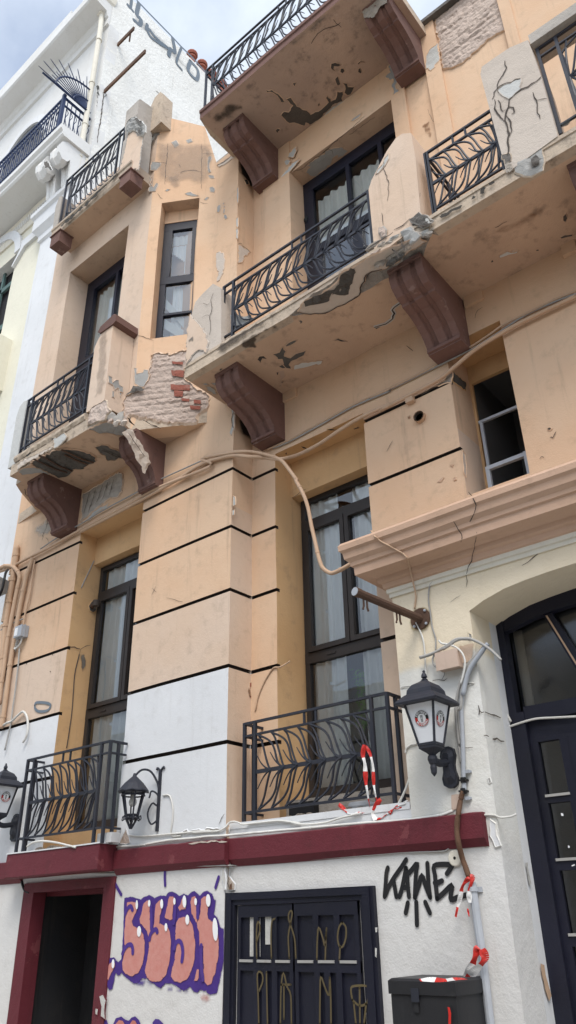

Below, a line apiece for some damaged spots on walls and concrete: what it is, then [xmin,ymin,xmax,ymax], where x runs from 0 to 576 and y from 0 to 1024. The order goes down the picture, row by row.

spalling [362,0,387,18]
flaking render [425,0,505,71]
peeling [266,62,355,133]
crack [492,61,547,155]
flaking render [185,156,251,282]
spalling [297,212,434,323]
flaking render [17,315,217,479]
peeling [257,339,323,383]
crack [374,302,401,328]
crack [452,493,476,601]